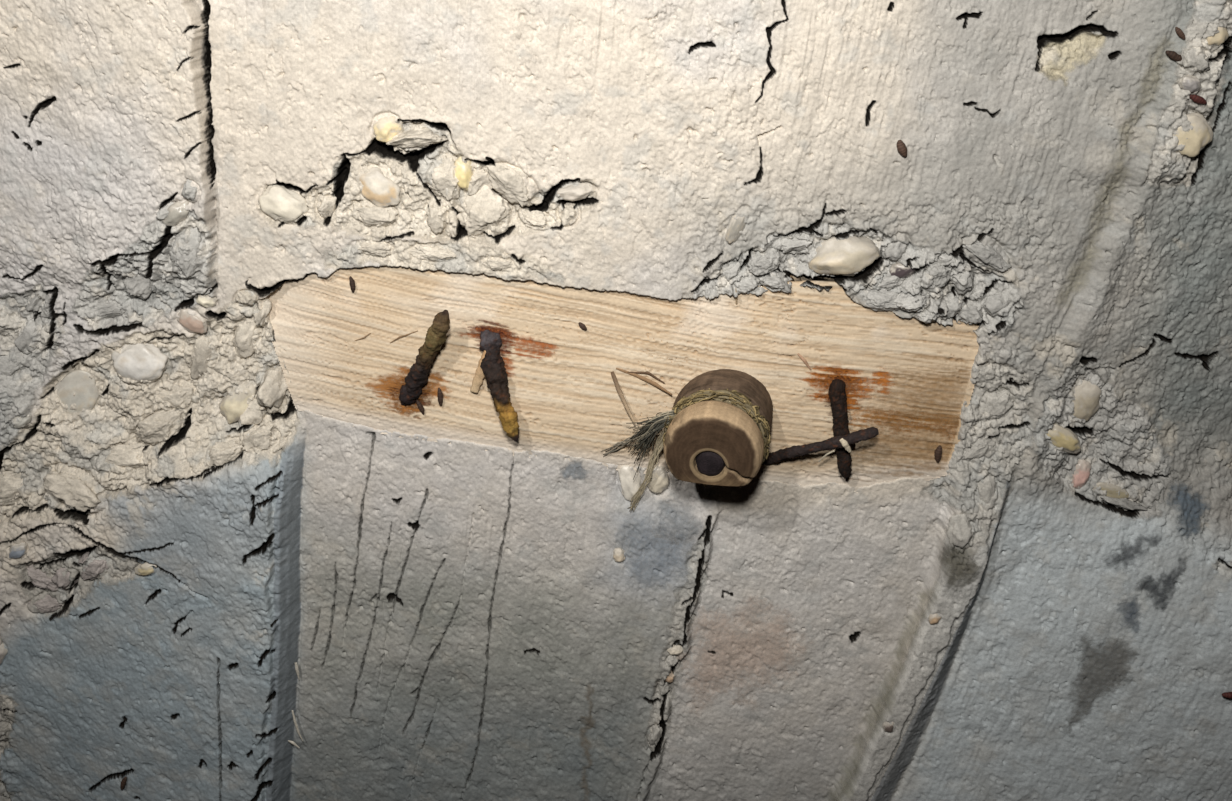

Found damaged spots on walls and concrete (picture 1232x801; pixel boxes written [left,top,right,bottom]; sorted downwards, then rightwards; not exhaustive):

crack [177,0,216,189]
crack [755,0,789,103]
crack [91,192,178,290]
spalling [257,121,597,284]
spalling [693,221,1027,336]
spalling [0,179,297,526]
crack [0,265,318,469]
corrosion [368,367,447,414]
corrosion [462,321,556,376]
corrosion [803,366,958,469]
spalling [920,353,1173,573]
spalling [9,547,142,618]